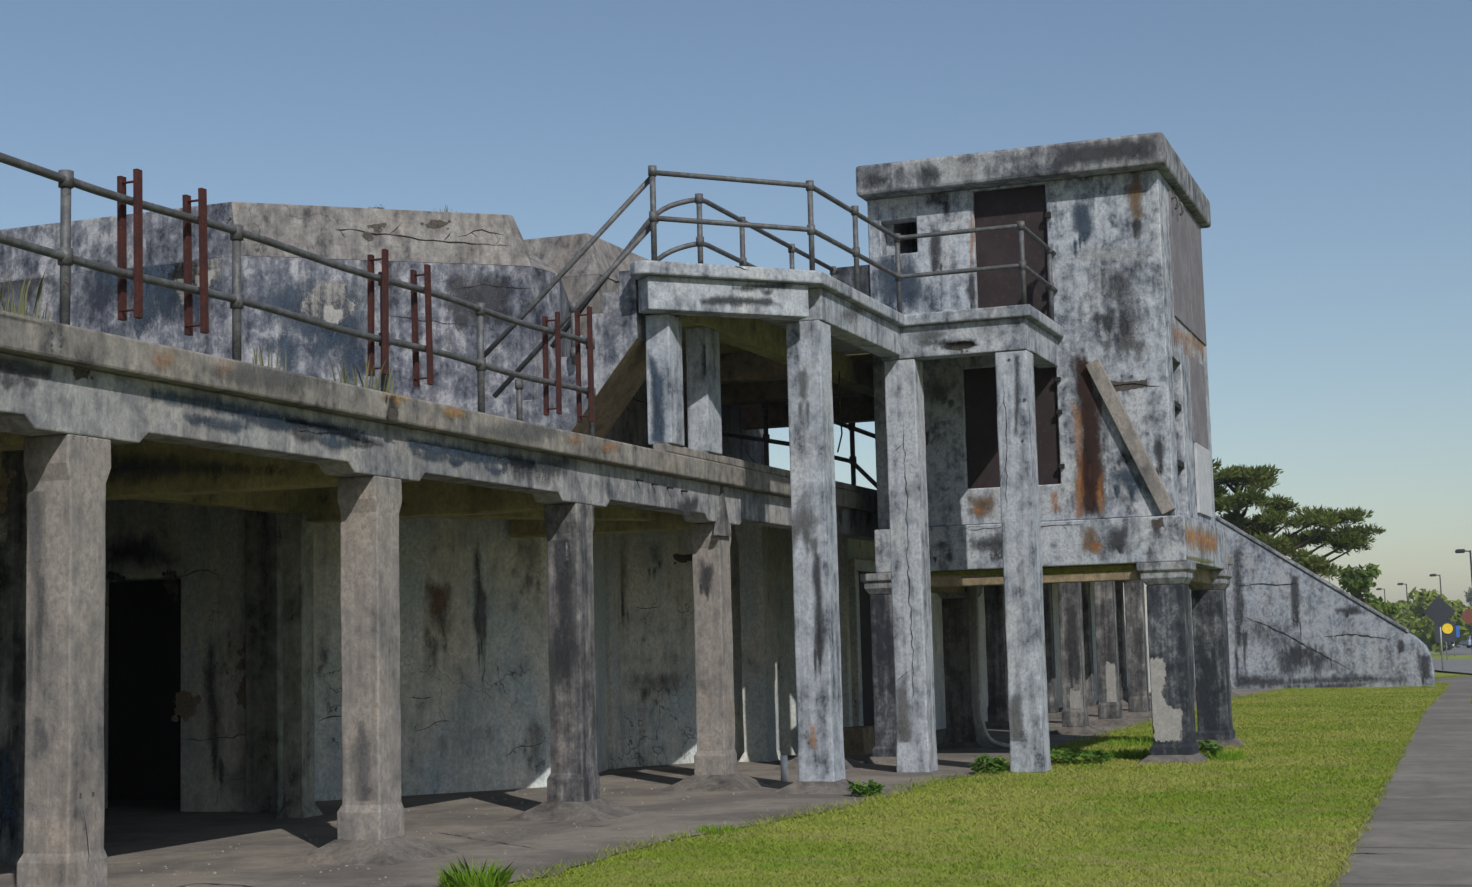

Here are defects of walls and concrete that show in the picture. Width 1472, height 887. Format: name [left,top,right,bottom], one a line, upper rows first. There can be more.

crack [337,222,507,246]
crack [396,279,527,332]
rust [1072,354,1105,552]
water stain [425,584,451,647]
water stain [474,550,486,663]
water stain [205,645,224,782]
peeling [1150,656,1183,742]